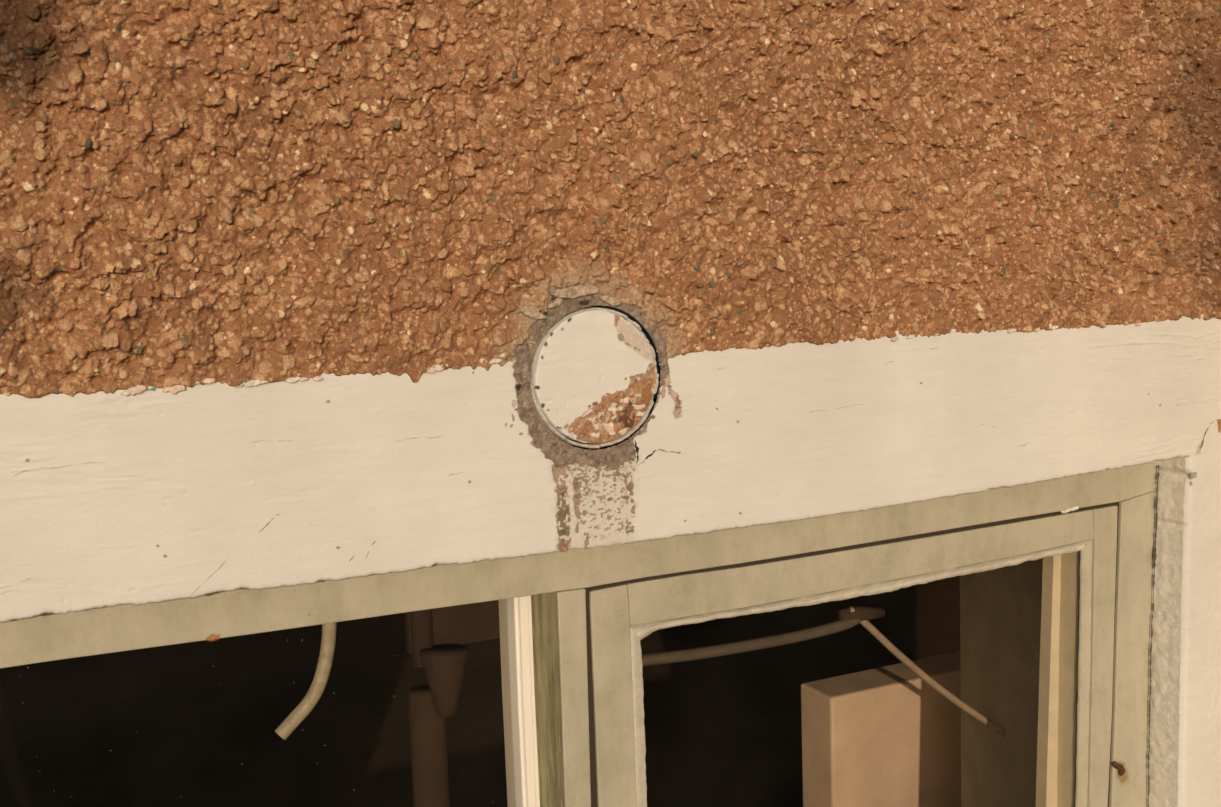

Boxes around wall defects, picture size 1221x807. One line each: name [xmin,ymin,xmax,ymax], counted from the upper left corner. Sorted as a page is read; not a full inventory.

spalling [489,281,682,552]